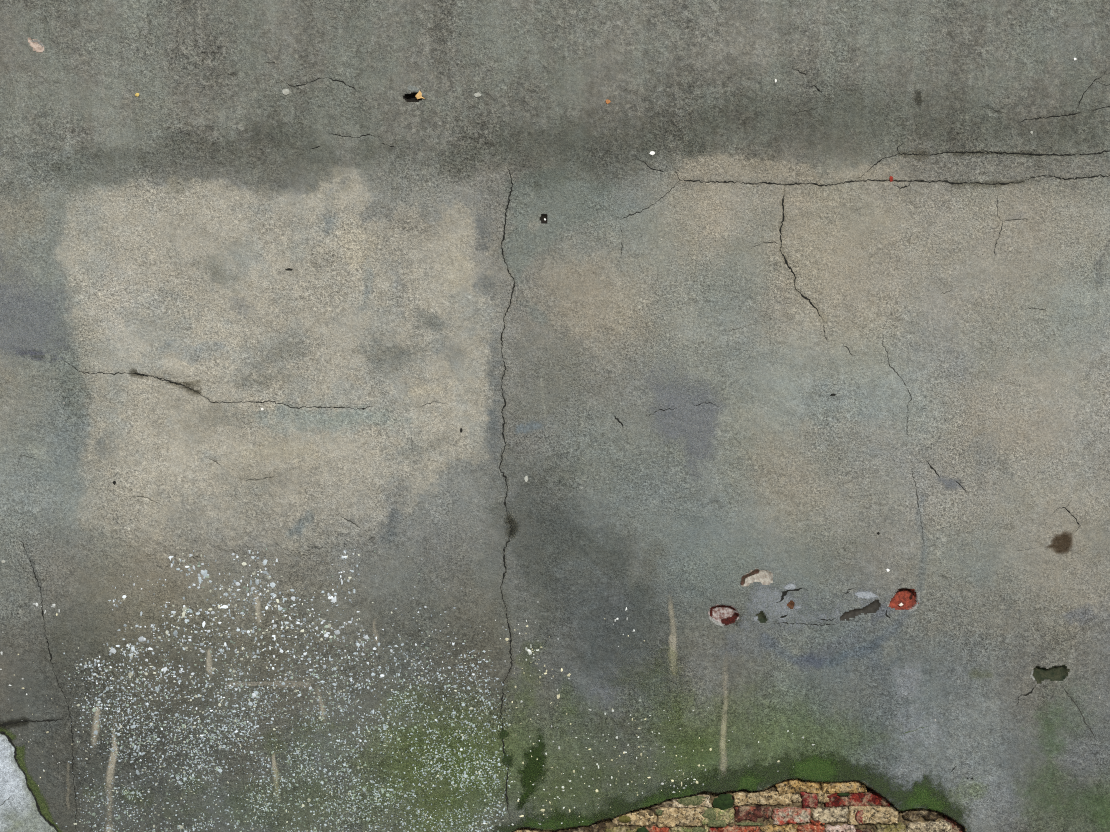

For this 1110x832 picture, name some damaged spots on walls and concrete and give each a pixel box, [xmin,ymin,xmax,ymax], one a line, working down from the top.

crack [1021,73,1110,122]
crack [620,147,1110,355]
crack [62,358,373,410]
crack [499,167,515,821]
crack [912,464,967,547]
spalling [708,569,920,628]
spalling [1030,665,1070,684]
leakage [92,707,100,744]
peeling [0,728,62,832]
leakage [106,734,118,832]
spalling [497,752,969,832]